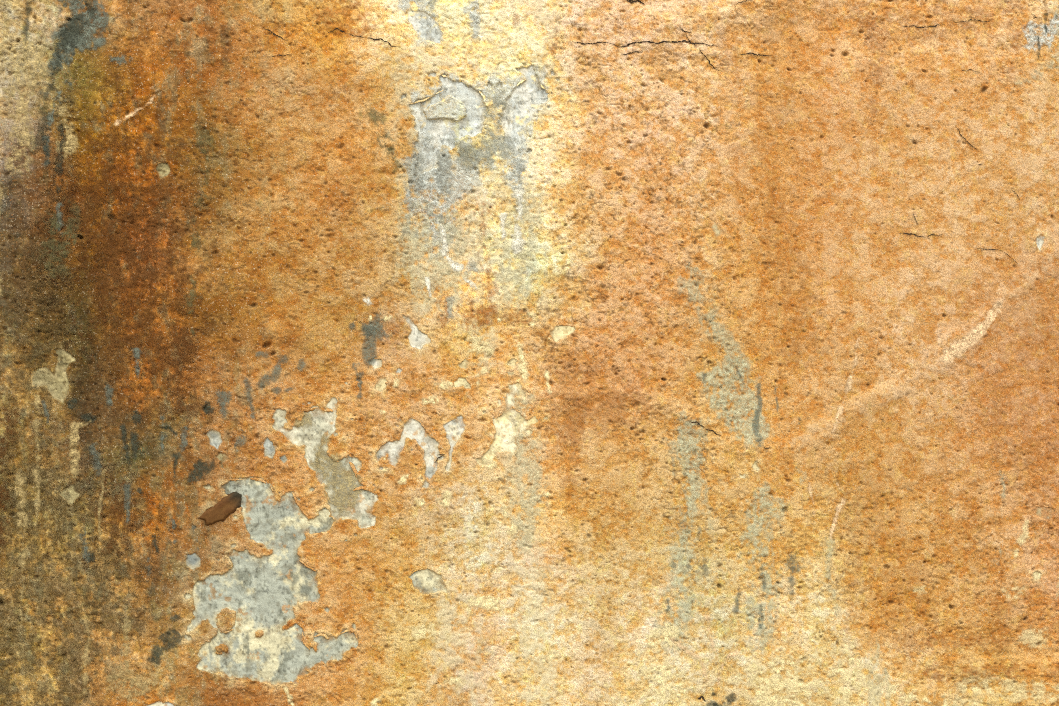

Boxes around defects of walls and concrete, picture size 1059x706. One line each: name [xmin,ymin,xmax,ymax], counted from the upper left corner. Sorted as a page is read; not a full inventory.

crack [575,27,719,71]
flaking render [401,65,550,184]
flaking render [185,395,465,685]